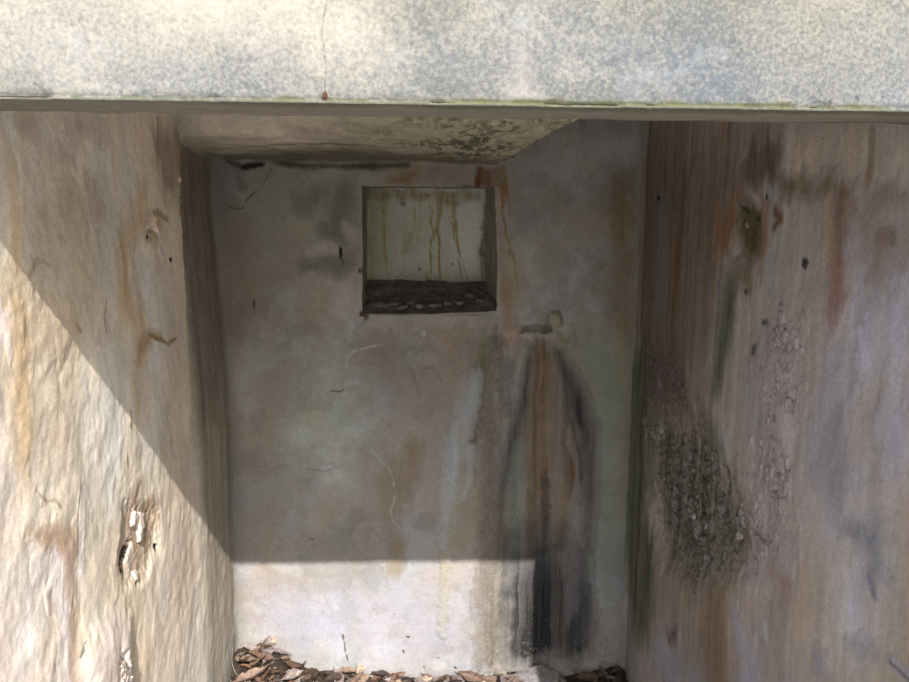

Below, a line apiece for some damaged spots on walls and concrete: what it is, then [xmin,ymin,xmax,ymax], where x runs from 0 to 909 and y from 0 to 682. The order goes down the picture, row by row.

crack [320,0,328,100]
rust [380,161,530,347]
spalling [116,473,162,591]
water stain [351,314,617,676]
spalling [642,193,815,616]